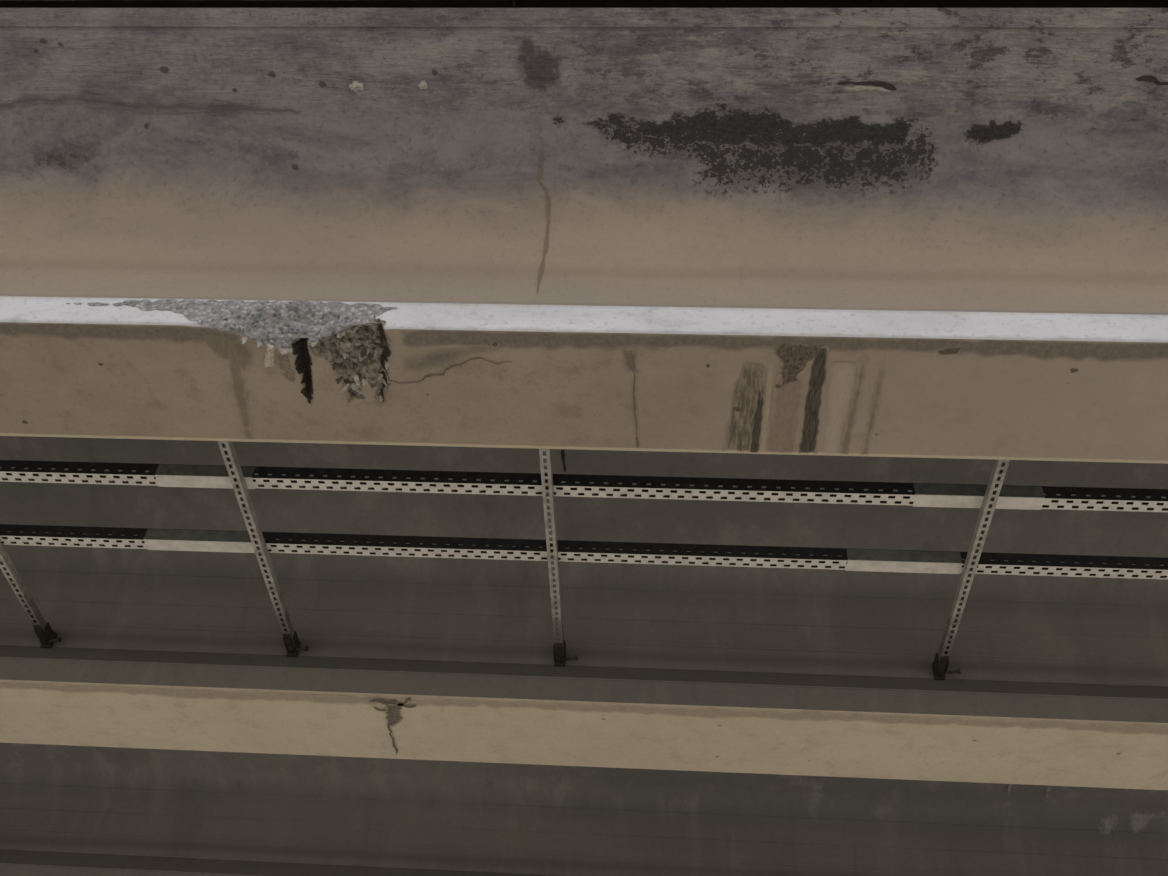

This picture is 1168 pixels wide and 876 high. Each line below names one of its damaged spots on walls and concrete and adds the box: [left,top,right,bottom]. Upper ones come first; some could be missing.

crack [537,148,550,293]
spalling [66,299,397,440]
damp [397,329,1168,374]